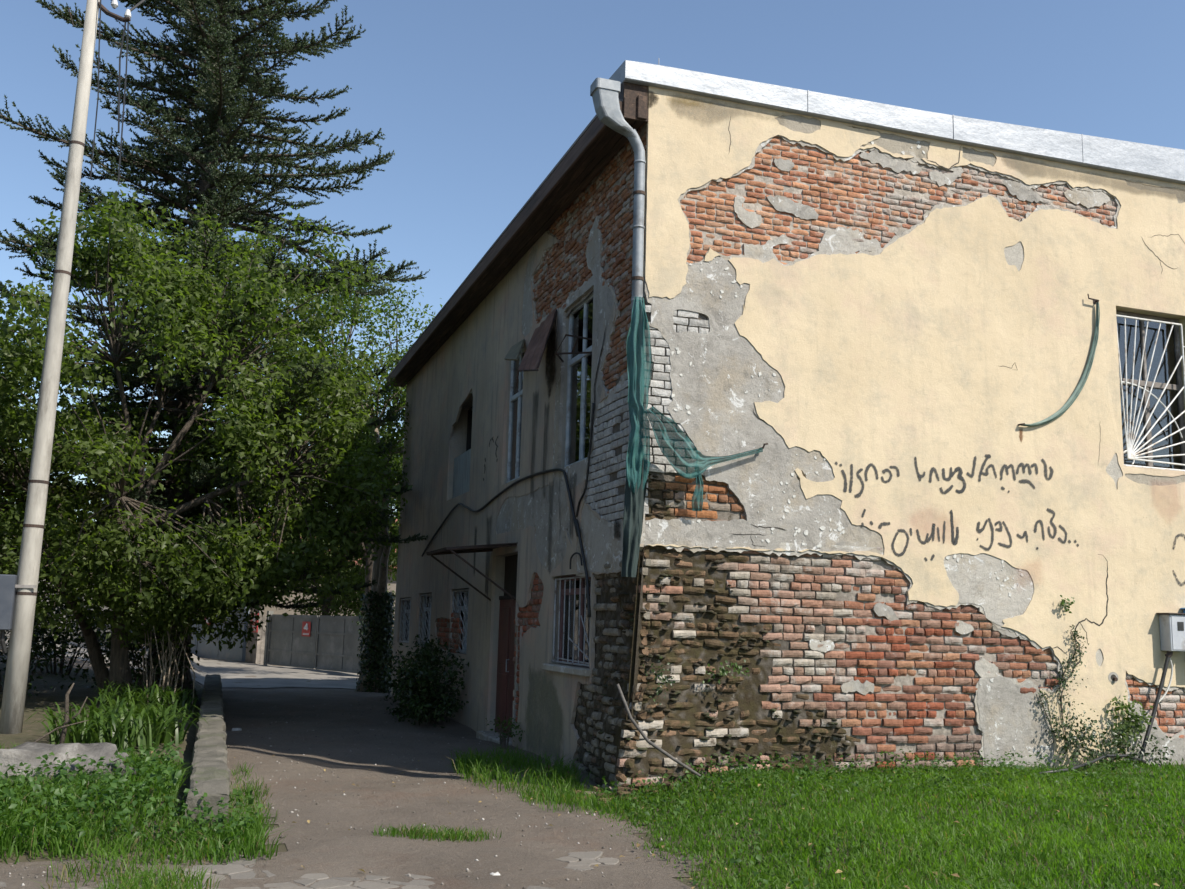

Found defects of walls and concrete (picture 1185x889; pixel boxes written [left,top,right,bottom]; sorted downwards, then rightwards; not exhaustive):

peeling [1125,180,1185,203]
crack [1142,234,1184,274]
flaking render [496,115,1121,793]
crack [1054,554,1109,732]
flaking render [1096,649,1185,765]